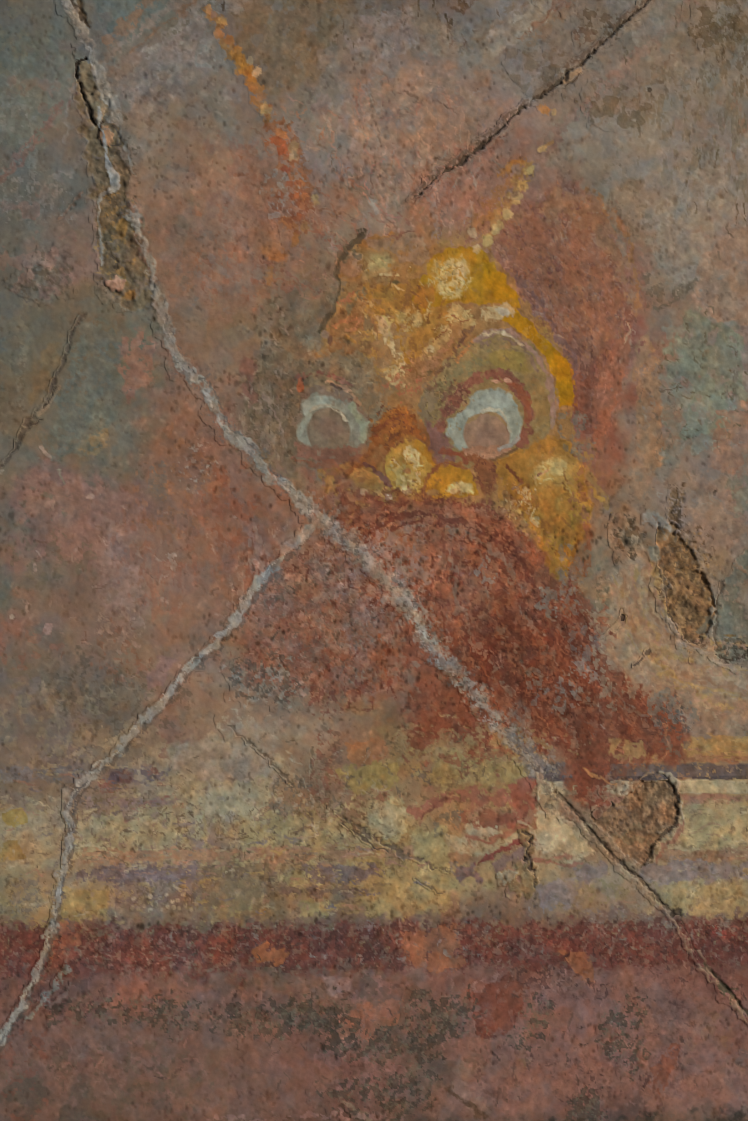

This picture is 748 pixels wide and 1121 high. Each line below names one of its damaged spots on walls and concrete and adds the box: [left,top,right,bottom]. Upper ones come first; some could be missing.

crack [406,0,656,207]
crack [0,310,89,476]
crack [596,607,628,641]
crack [632,647,652,668]
flaking render [605,483,748,674]
crack [0,517,322,1058]
crack [327,805,451,896]
flaking render [588,769,690,871]